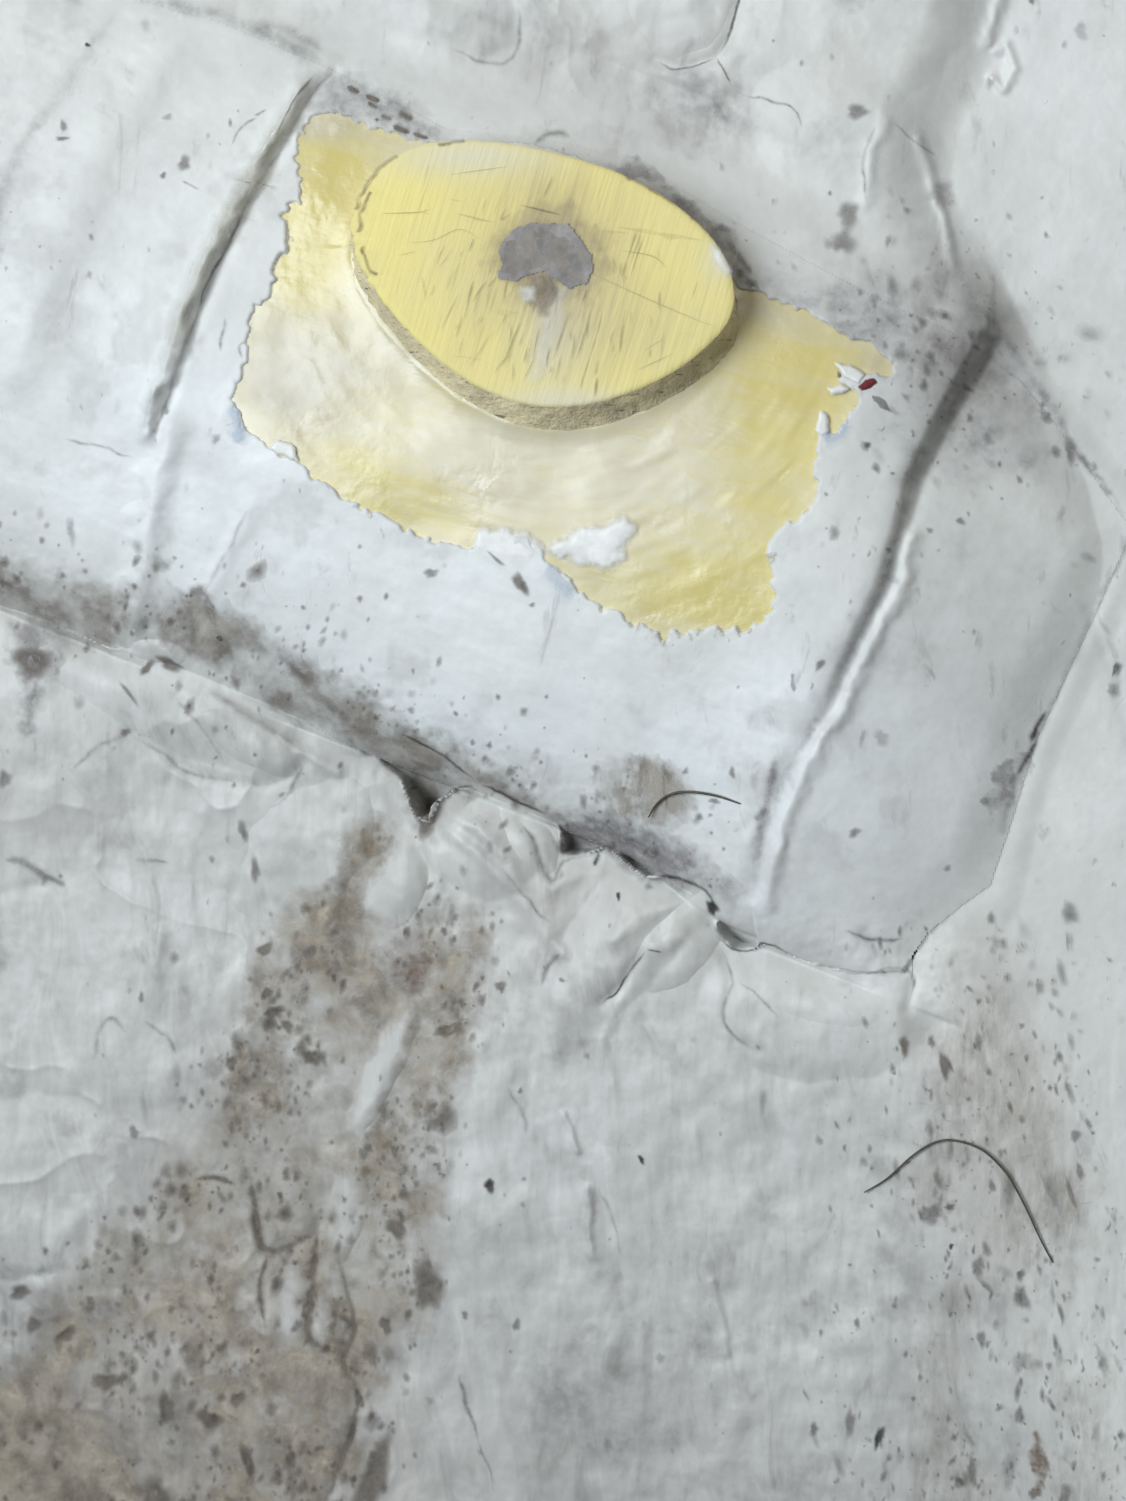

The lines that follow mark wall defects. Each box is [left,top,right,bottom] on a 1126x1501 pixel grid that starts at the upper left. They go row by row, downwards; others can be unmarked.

peeling [229,86,894,644]
leakage [0,562,125,678]
leakage [158,588,265,663]
leakage [269,663,451,810]
leakage [561,757,695,883]
leakage [225,1052,288,1135]
leakage [276,829,486,1224]
leakage [0,1302,140,1501]
leakage [125,1226,407,1501]